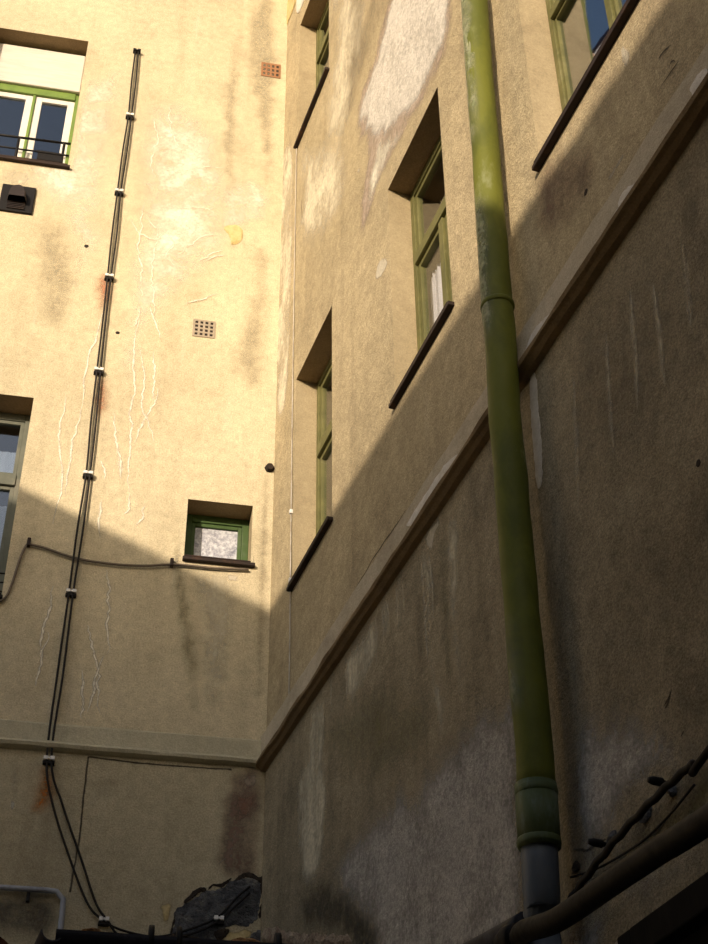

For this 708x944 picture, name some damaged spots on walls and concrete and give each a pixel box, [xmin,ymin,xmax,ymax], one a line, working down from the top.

flaking render [287,0,304,25]
flaking render [358,0,450,226]
leakage [423,521,457,612]
leakage [346,627,377,704]
leakage [221,771,258,874]
leakage [299,706,325,880]
leakage [304,706,520,944]
spalling [161,872,262,942]